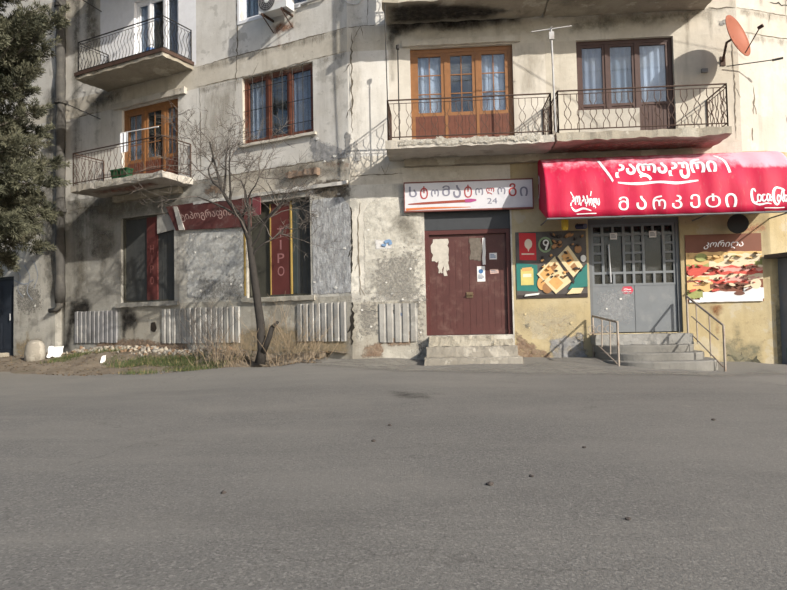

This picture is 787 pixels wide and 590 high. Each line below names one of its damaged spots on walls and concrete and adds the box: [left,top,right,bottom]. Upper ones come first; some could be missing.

crack [708,0,787,39]
crack [199,0,385,193]
crack [251,165,397,199]
peeling [310,132,361,164]
crack [732,46,757,139]
peeling [311,179,351,294]
crack [347,205,394,345]
peeling [354,251,427,357]